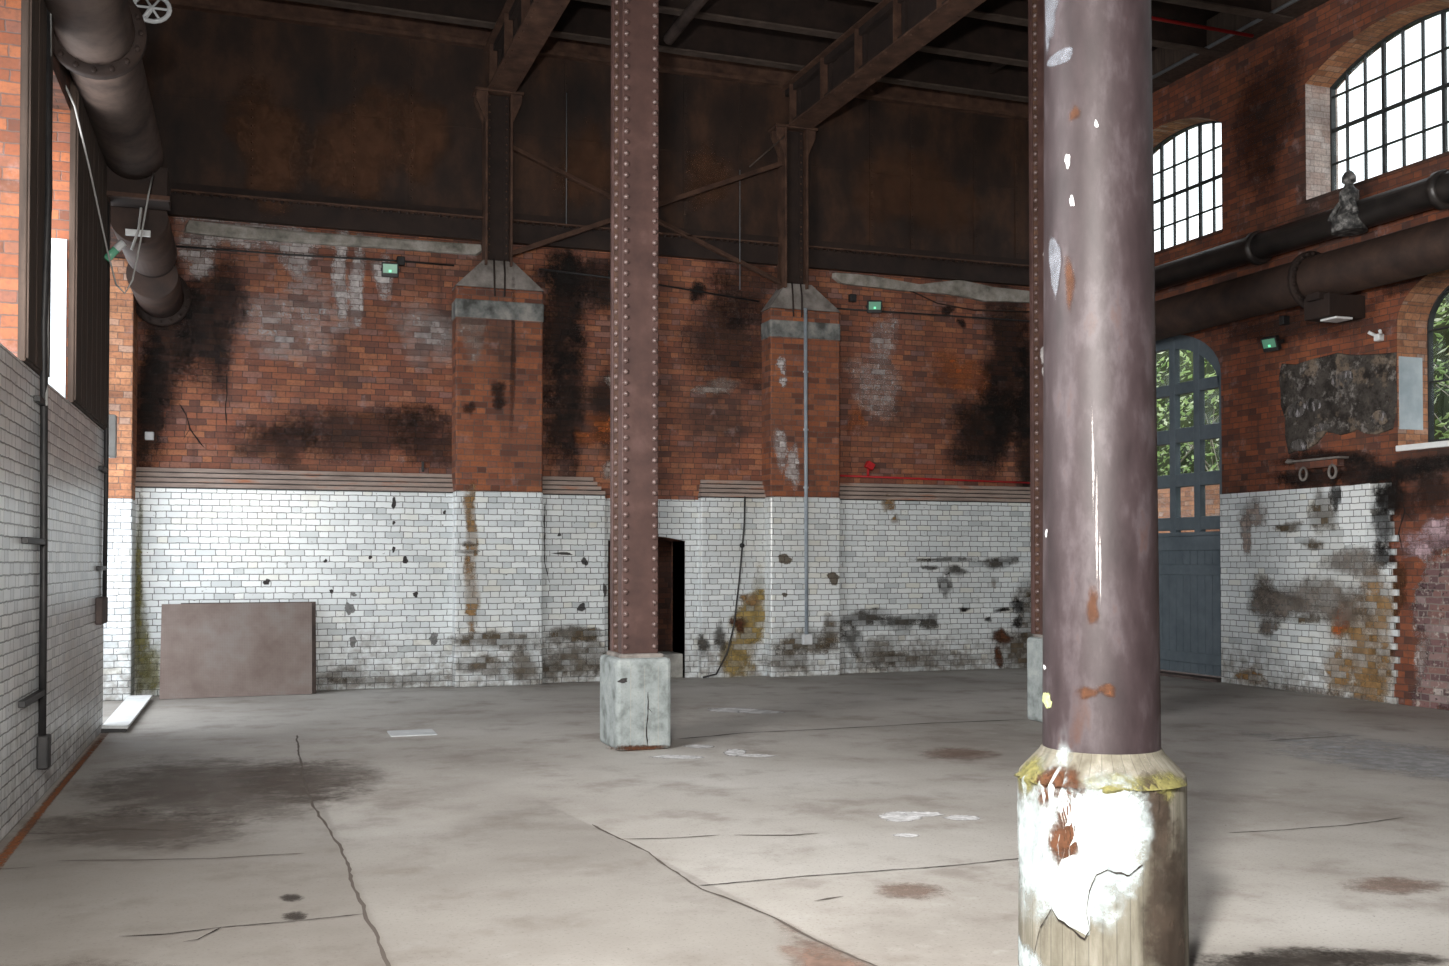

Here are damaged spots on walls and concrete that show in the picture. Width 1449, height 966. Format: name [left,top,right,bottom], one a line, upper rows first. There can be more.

leakage [331,231,389,327]
leakage [137,218,312,467]
leakage [1277,455,1423,514]
corrosion [463,485,480,632]
leakage [697,589,959,676]
leakage [917,557,1018,594]
leakage [985,584,1046,670]
leakage [1278,542,1395,702]
spalling [1411,550,1449,710]
crack [132,735,391,966]
corrosion [1035,766,1084,865]
peeling [1052,855,1108,936]